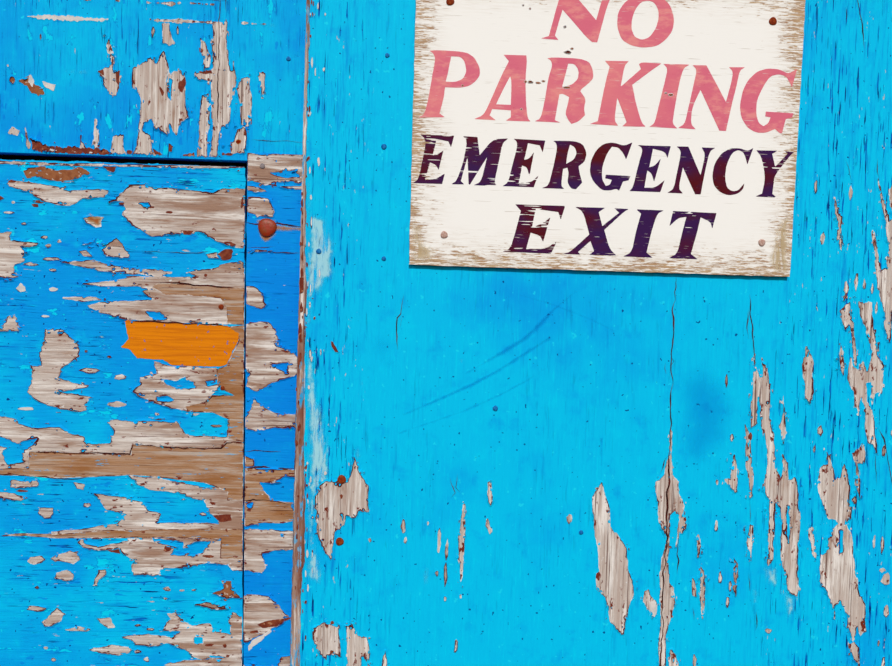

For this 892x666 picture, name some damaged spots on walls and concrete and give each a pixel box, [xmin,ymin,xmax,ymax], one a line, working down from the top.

peeling [0,0,340,502]
peeling [26,454,371,666]
spalling [400,518,408,544]
crack [660,288,679,666]
peeling [591,176,892,666]